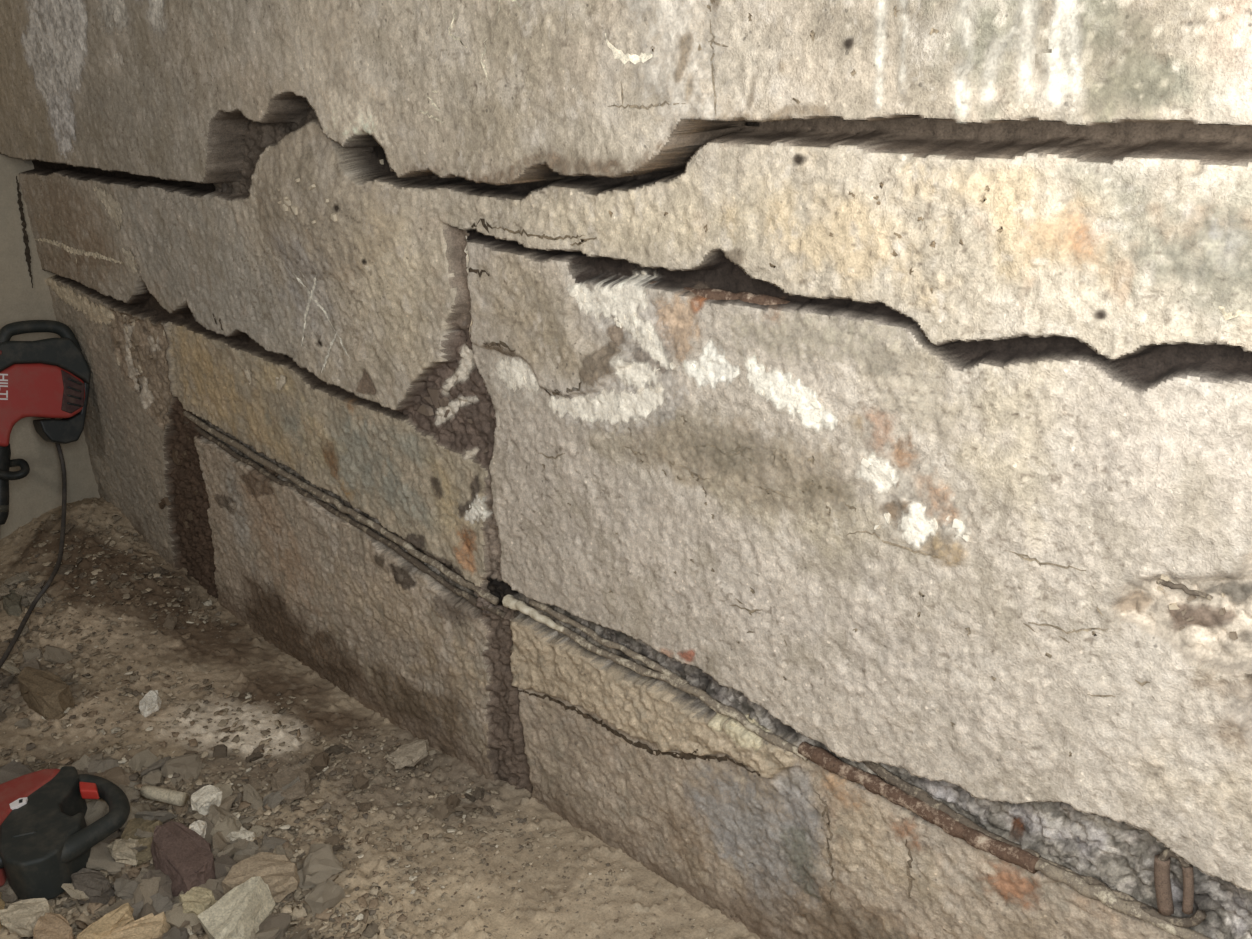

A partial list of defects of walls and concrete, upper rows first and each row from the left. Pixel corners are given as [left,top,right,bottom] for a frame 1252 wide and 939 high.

spalling [196,92,430,201]
spalling [481,153,689,185]
crack [383,0,1252,394]
crack [0,153,405,422]
crack [544,378,582,397]
leakage [564,292,688,431]
leakage [859,447,972,564]
crack [197,415,1252,939]
corrosion [1012,818,1025,835]